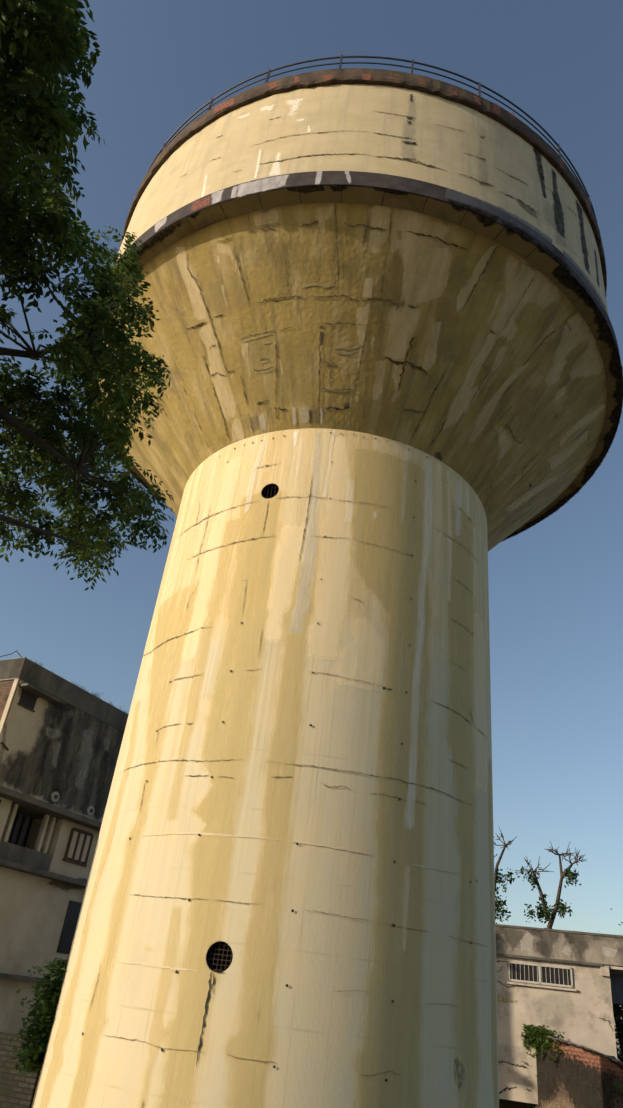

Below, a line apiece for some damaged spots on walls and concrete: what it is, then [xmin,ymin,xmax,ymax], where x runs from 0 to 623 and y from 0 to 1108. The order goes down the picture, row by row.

leakage [133,212,200,256]
leakage [286,185,350,193]
leakage [373,187,409,195]
leakage [533,147,566,243]
crack [182,258,291,446]
crack [218,204,497,445]
crack [470,273,576,494]
leakage [448,198,623,542]
leakage [0,407,521,1108]
crack [104,970,273,1067]
leakage [529,1045,623,1108]